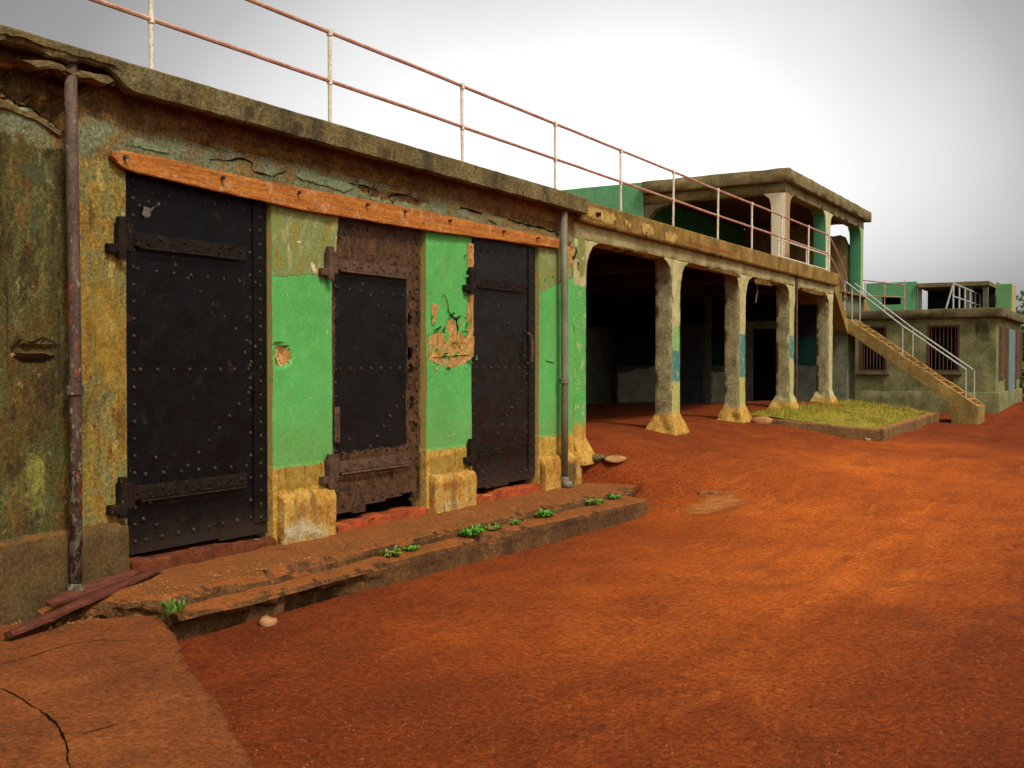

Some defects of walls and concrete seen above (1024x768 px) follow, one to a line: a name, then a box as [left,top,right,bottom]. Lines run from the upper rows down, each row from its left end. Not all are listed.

spalling [0,59,117,137]
crack [209,157,287,177]
crack [349,183,417,205]
peeling [272,204,338,279]
peeling [463,243,474,278]
spalling [12,344,55,361]
water stain [94,283,117,382]
spalling [275,345,291,366]
peeling [428,290,478,374]
crack [0,688,149,768]